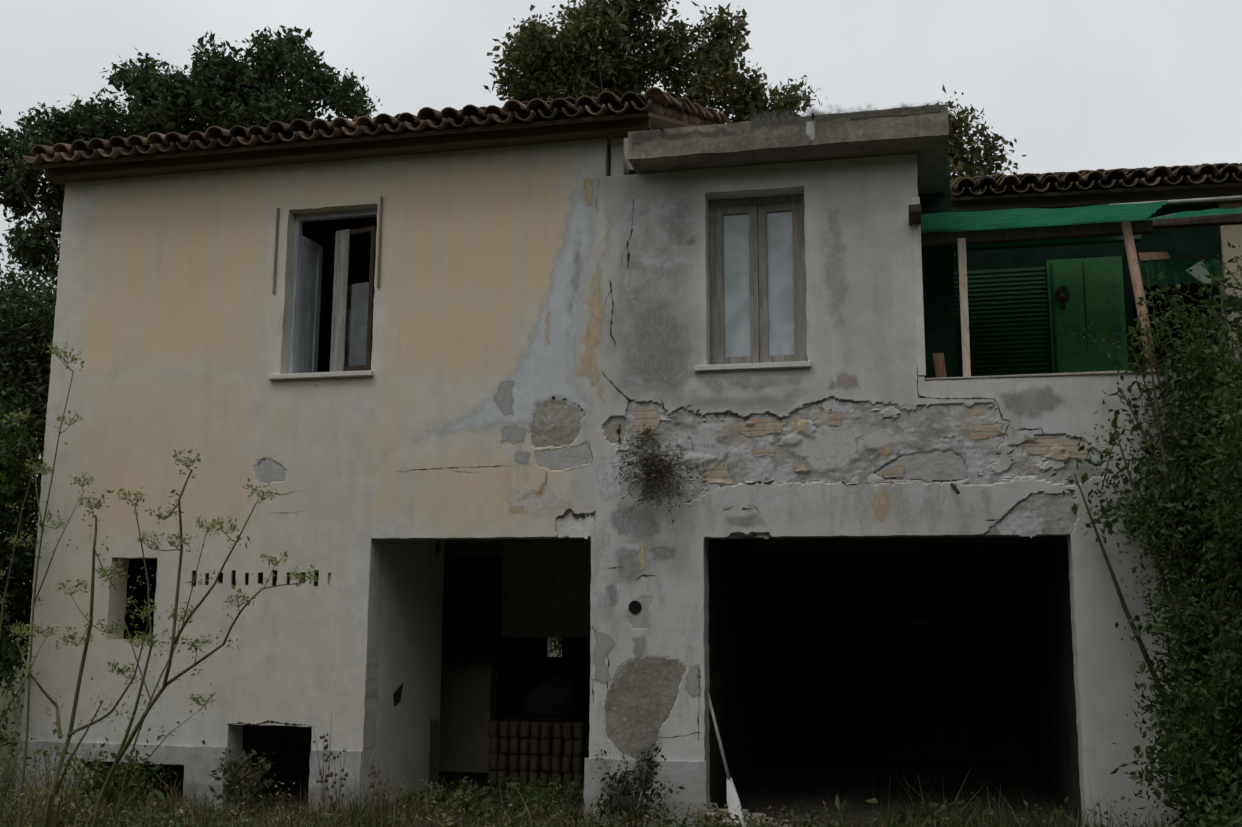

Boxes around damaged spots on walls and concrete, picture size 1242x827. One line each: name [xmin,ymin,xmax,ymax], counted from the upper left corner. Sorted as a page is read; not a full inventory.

damp [439,179,603,430]
flaking render [254,459,285,483]
crack [408,465,503,473]
flaking render [494,380,591,469]
flaking render [603,399,1107,538]
flaking render [557,512,594,539]
flaking render [605,656,700,759]